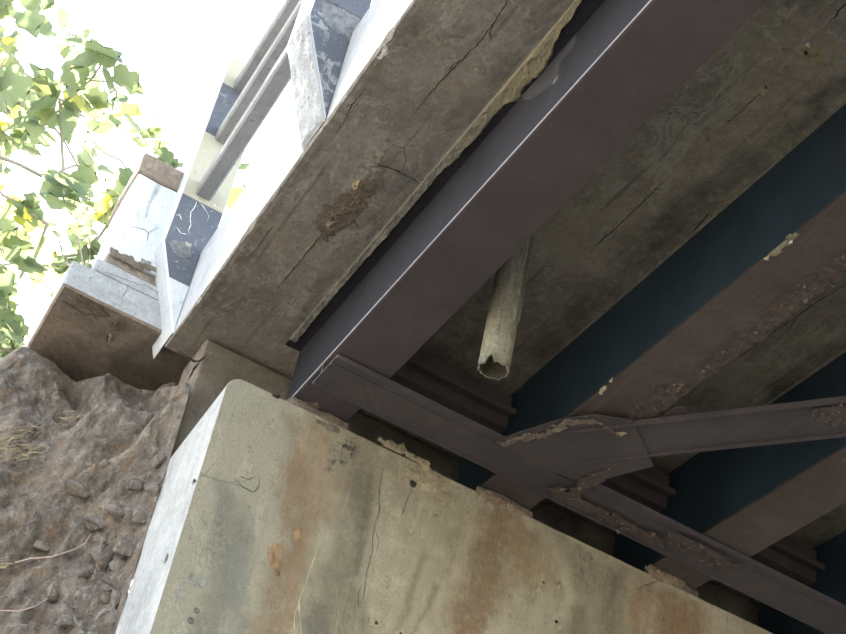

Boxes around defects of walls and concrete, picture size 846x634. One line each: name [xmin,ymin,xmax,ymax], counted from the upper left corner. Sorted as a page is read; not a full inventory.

crack [410,0,507,118]
crack [363,145,420,184]
peeling [109,247,156,272]
crack [278,227,326,288]
spalling [377,436,453,518]
crack [358,468,383,609]